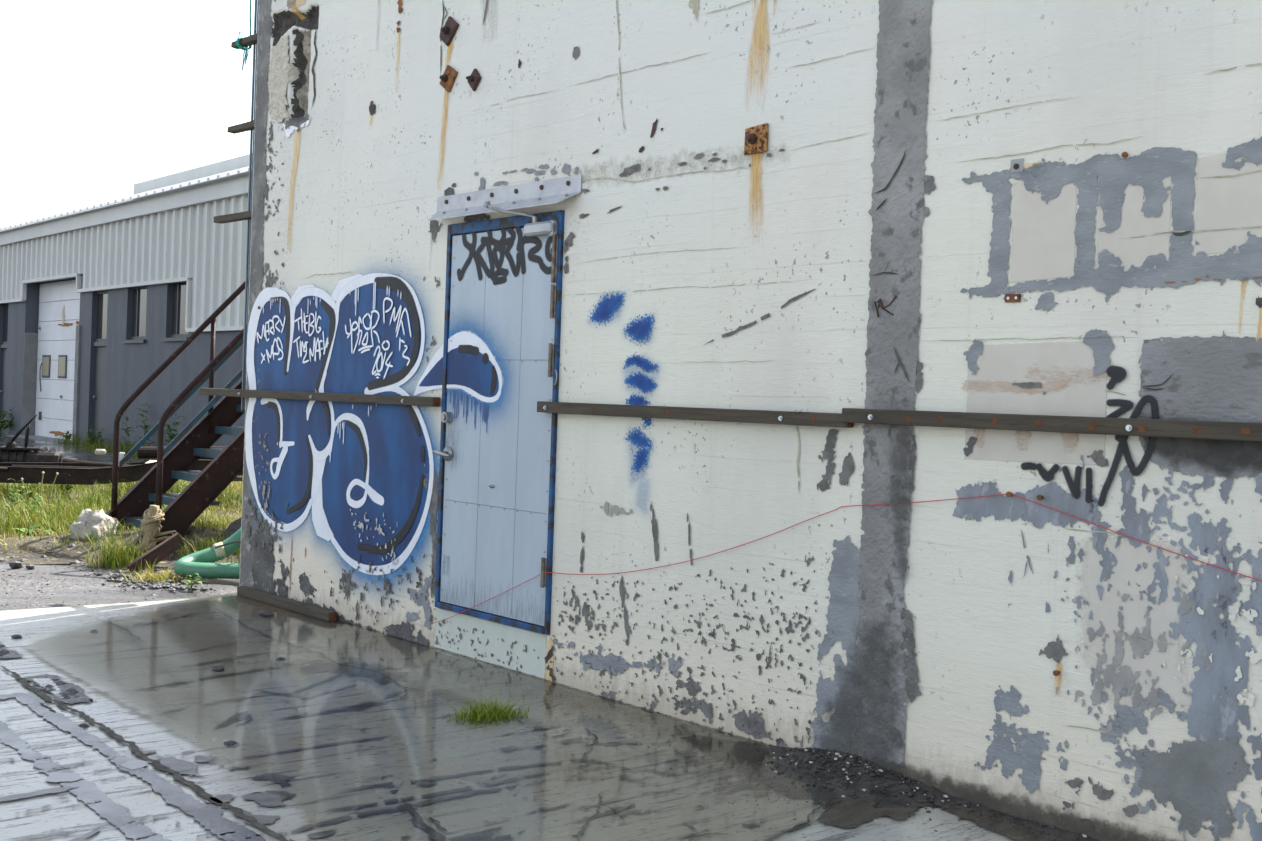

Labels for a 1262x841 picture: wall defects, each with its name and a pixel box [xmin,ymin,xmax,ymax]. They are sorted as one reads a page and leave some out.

corrosion [753,0,766,55]
corrosion [750,153,760,203]
peeling [236,0,936,836]
peeling [953,436,1262,841]
peeling [449,818,525,841]